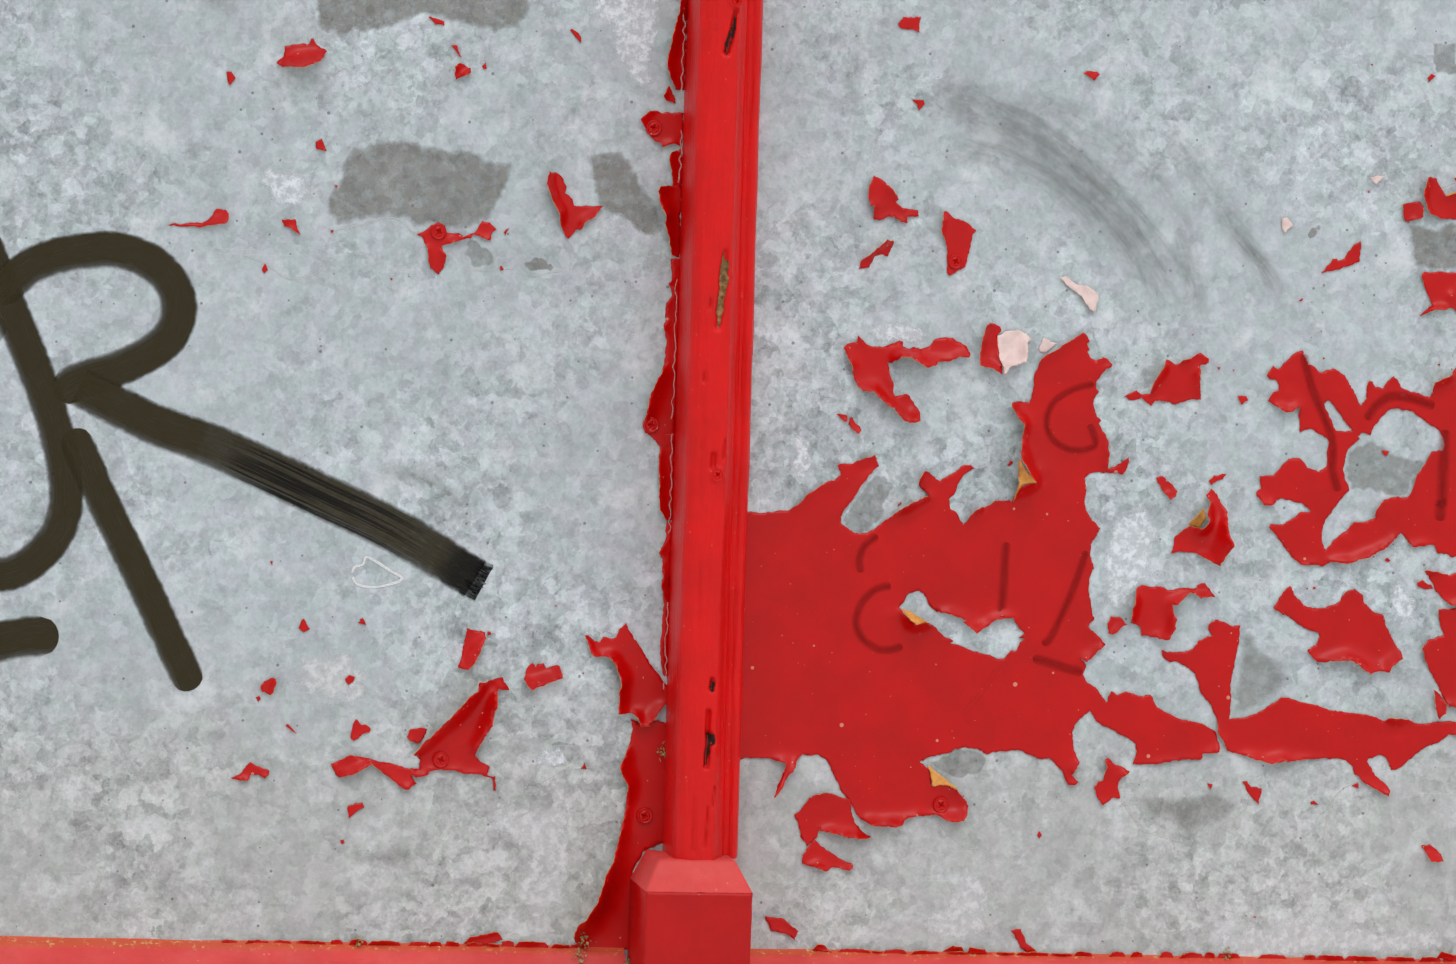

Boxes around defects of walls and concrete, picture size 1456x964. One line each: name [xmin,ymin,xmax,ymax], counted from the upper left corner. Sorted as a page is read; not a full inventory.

peeling [868,176,919,223]
peeling [1403,177,1456,222]
peeling [859,239,894,269]
peeling [941,211,976,276]
peeling [1420,271,1456,316]
peeling [221,0,688,950]
peeling [740,323,1456,872]